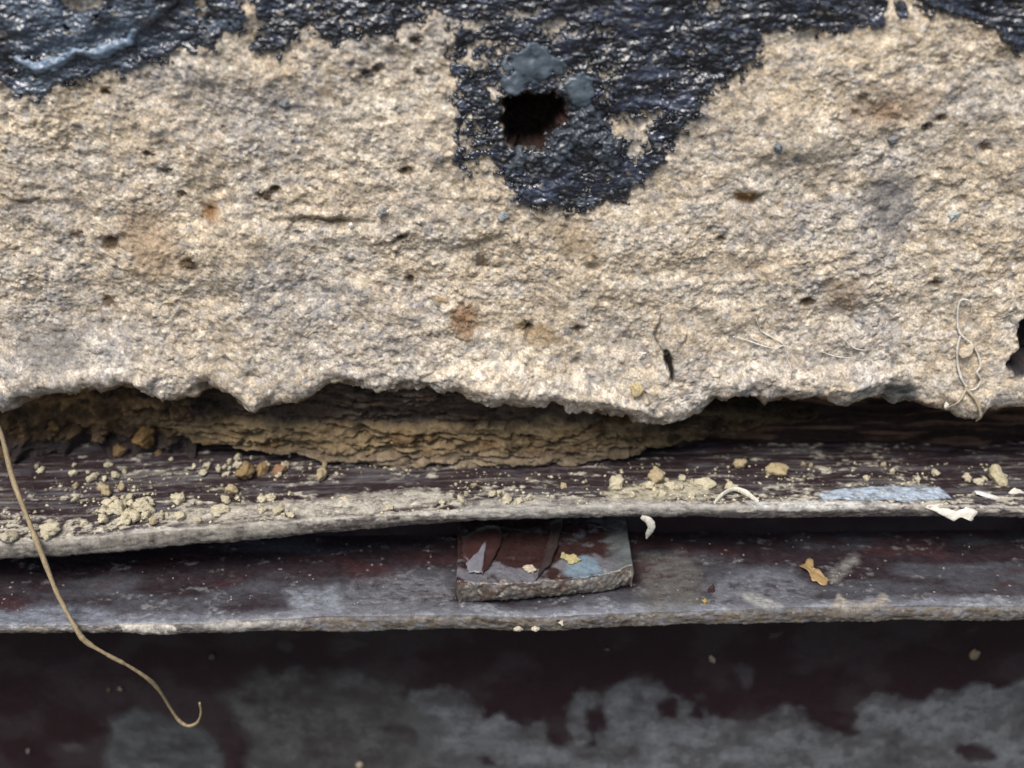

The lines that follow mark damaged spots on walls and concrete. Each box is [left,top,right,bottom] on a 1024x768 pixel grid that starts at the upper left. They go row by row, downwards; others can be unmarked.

spalling [0,386,197,466]
spalling [672,396,1024,446]
water stain [104,710,222,768]
water stain [229,671,1024,768]